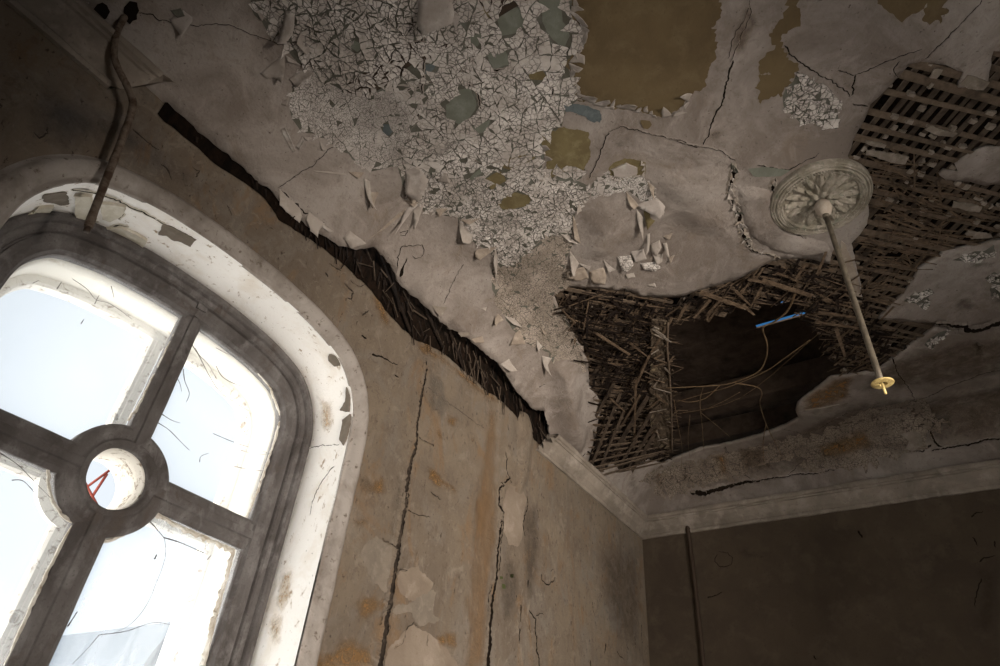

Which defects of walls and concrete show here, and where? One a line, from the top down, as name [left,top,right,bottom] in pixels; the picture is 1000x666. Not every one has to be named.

crack [589,0,819,178]
crack [784,0,983,107]
peeling [28,191,148,248]
flaking render [158,0,1000,476]
crack [891,358,1000,454]
crack [324,263,555,666]
flaking render [503,484,527,547]
crack [689,468,835,500]
flaking render [360,536,458,666]